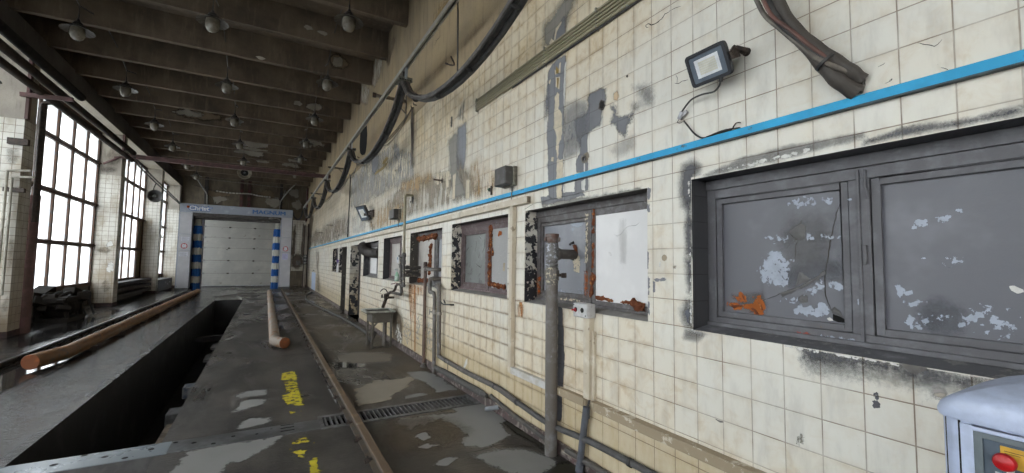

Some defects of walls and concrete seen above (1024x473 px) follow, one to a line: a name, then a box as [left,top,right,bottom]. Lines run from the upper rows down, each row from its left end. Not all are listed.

peeling [549,62,567,179]
peeling [332,230,369,315]
peeling [451,225,462,290]
peeling [524,212,537,302]
rust [727,291,766,315]
peeling [756,235,843,318]